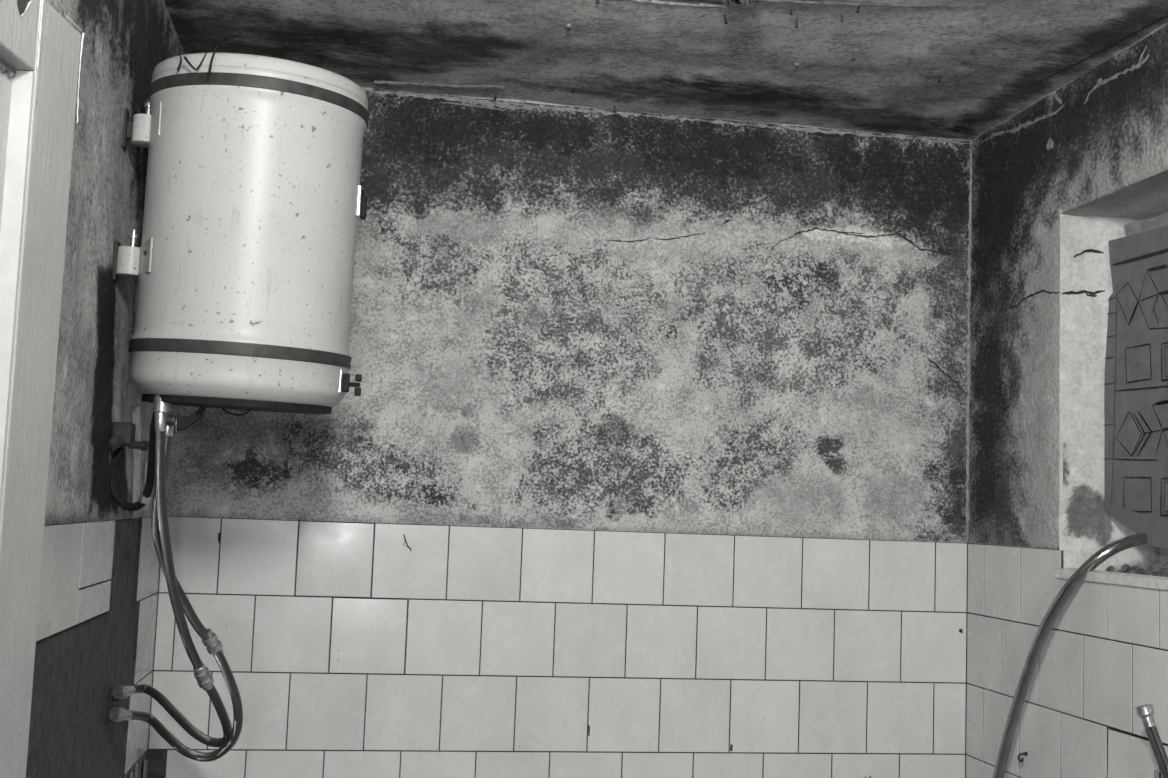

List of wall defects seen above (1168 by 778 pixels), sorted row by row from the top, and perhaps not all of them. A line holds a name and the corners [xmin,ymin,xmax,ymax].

crack [607,220,730,242]
crack [1074,249,1103,258]
leakage [360,24,1168,546]
crack [1007,289,1105,308]
mould [227,421,477,509]